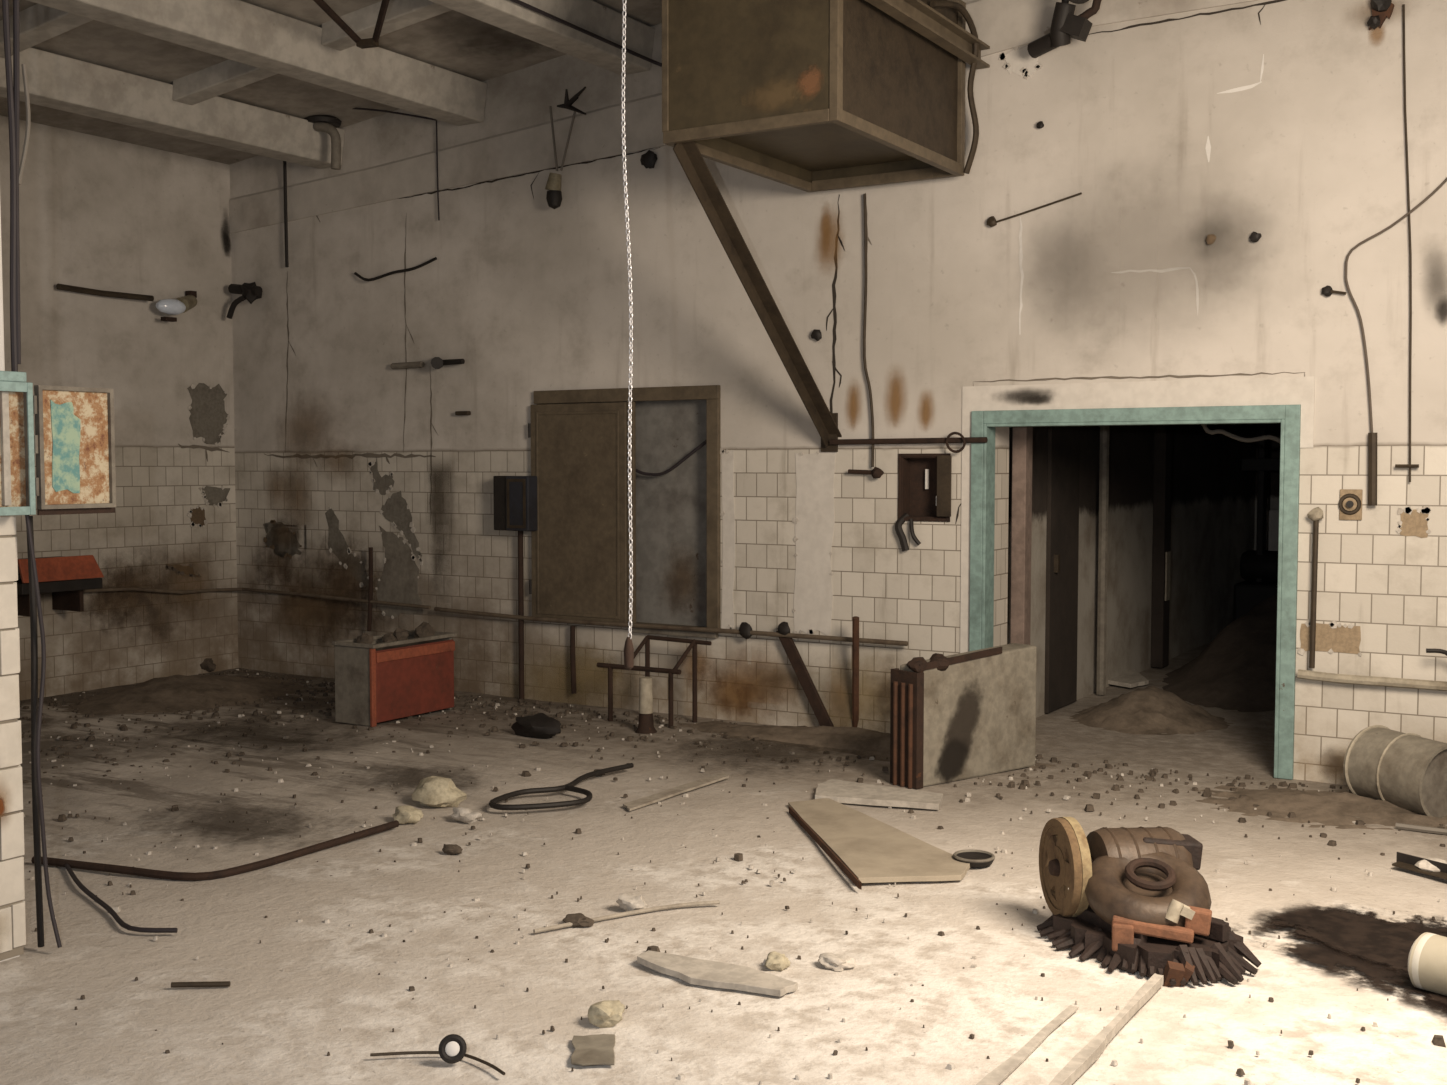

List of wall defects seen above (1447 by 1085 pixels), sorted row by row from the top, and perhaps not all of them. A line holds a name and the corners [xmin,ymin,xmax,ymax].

peeling [187,383,230,446]
rust [849,394,858,418]
rust [890,383,901,412]
rust [922,400,930,421]
flaking render [325,458,423,619]
damp [93,572,184,629]
damp [937,690,980,782]